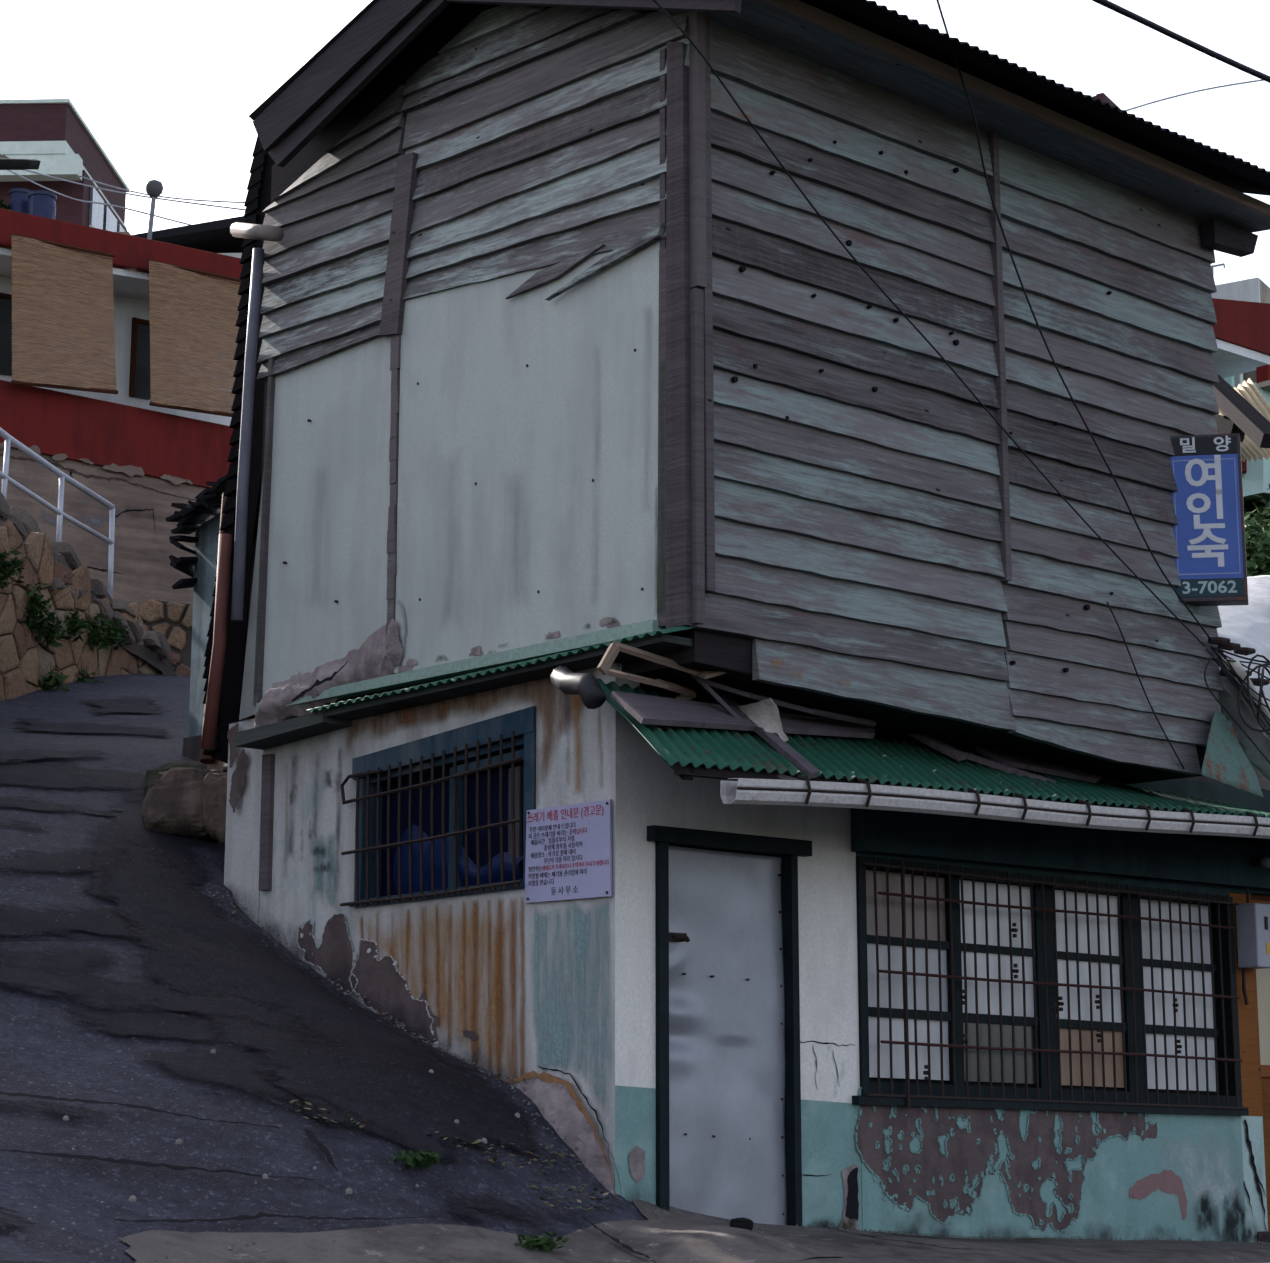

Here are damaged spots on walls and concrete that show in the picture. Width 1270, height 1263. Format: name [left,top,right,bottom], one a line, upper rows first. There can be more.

peeling [586,617,620,628]
peeling [295,913,439,1049]
corrosion [361,901,524,1081]
spalling [507,1066,645,1198]
crack [800,1041,853,1090]
peeling [839,1087,1158,1233]